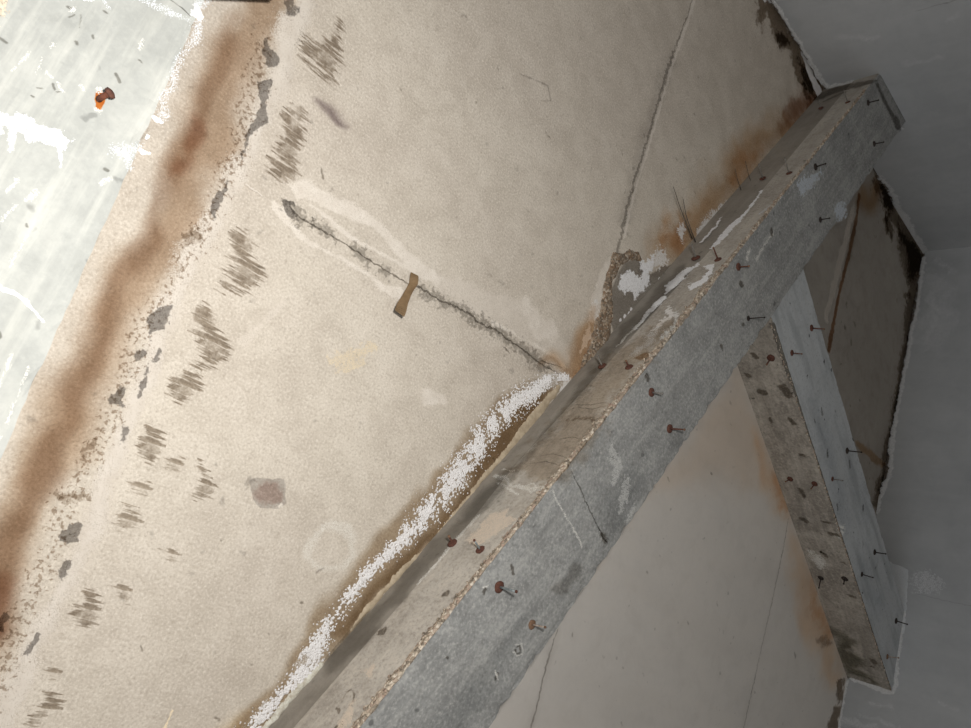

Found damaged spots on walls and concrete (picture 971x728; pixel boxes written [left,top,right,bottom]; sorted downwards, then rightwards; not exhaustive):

damp [156,1,213,121]
damp [0,111,74,168]
crack [623,0,696,239]
damp [271,200,415,298]
damp [579,299,601,357]
damp [618,244,714,357]
damp [676,190,784,249]
damp [877,183,893,219]
damp [890,229,923,285]
spalling [350,89,866,728]
damp [235,320,571,728]